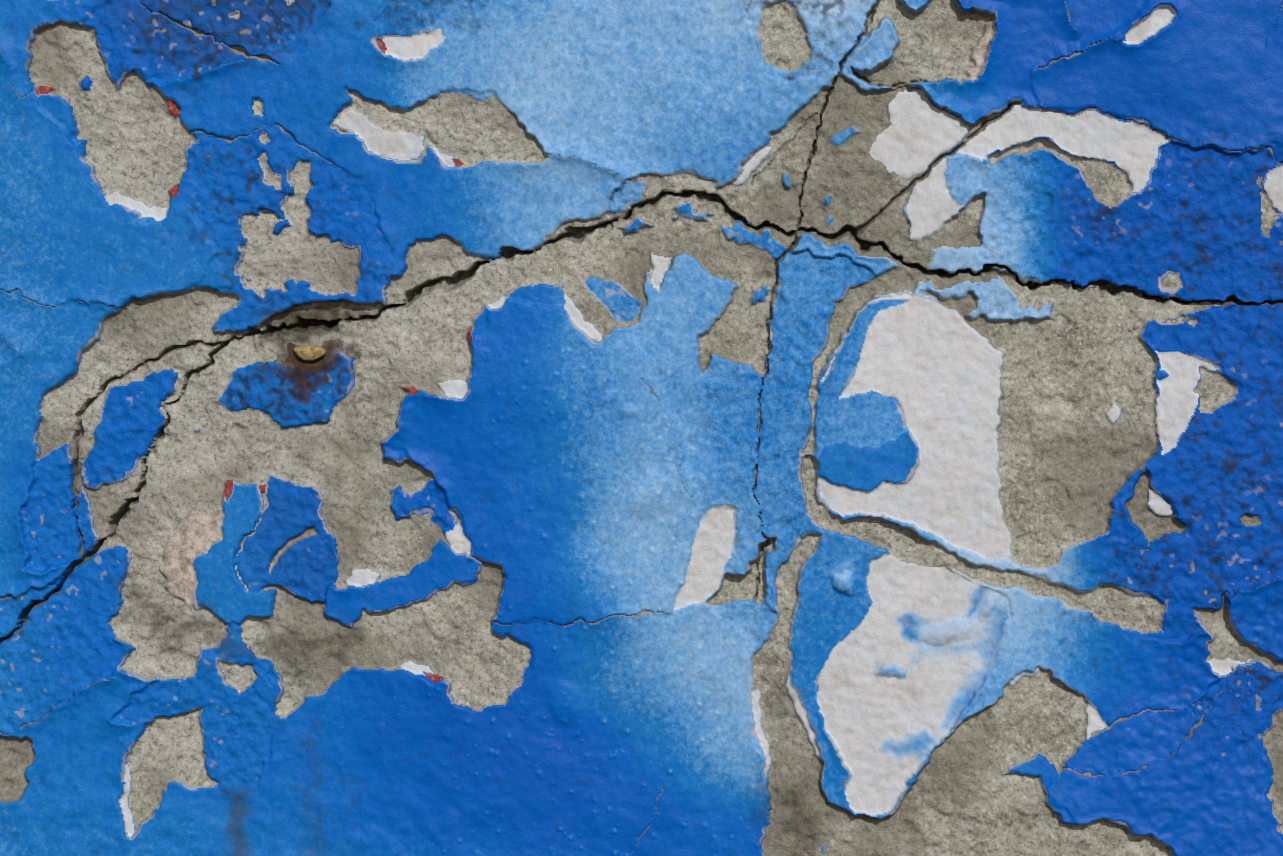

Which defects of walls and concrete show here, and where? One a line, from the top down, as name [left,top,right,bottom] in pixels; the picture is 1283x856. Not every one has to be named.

crack [129,0,284,67]
peeling [853,0,997,87]
peeling [29,22,194,222]
crack [189,122,343,171]
peeling [330,88,549,167]
crack [337,0,1283,602]
crack [0,321,301,644]
peeling [36,159,798,718]
peeling [716,76,1237,856]
crack [490,610,674,628]
peeling [120,709,219,839]
crack [1062,667,1254,780]